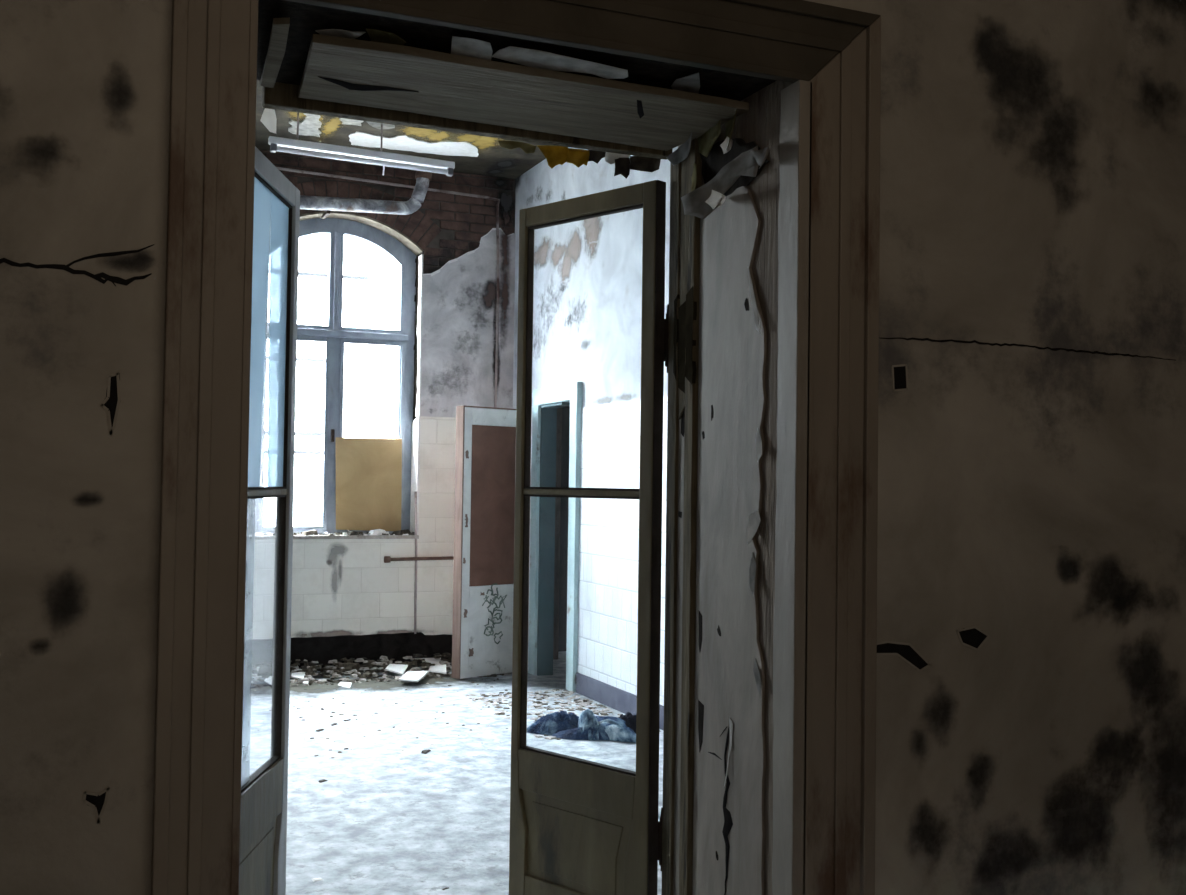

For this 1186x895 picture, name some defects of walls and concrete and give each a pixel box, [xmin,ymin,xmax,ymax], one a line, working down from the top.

peeling [316,28,406,45]
peeling [451,36,628,79]
peeling [671,73,700,94]
peeling [260,108,322,137]
peeling [339,118,479,157]
peeling [498,112,770,219]
damp [534,217,602,290]
flaking render [260,150,515,420]
damp [329,547,344,592]
crack [708,717,733,895]